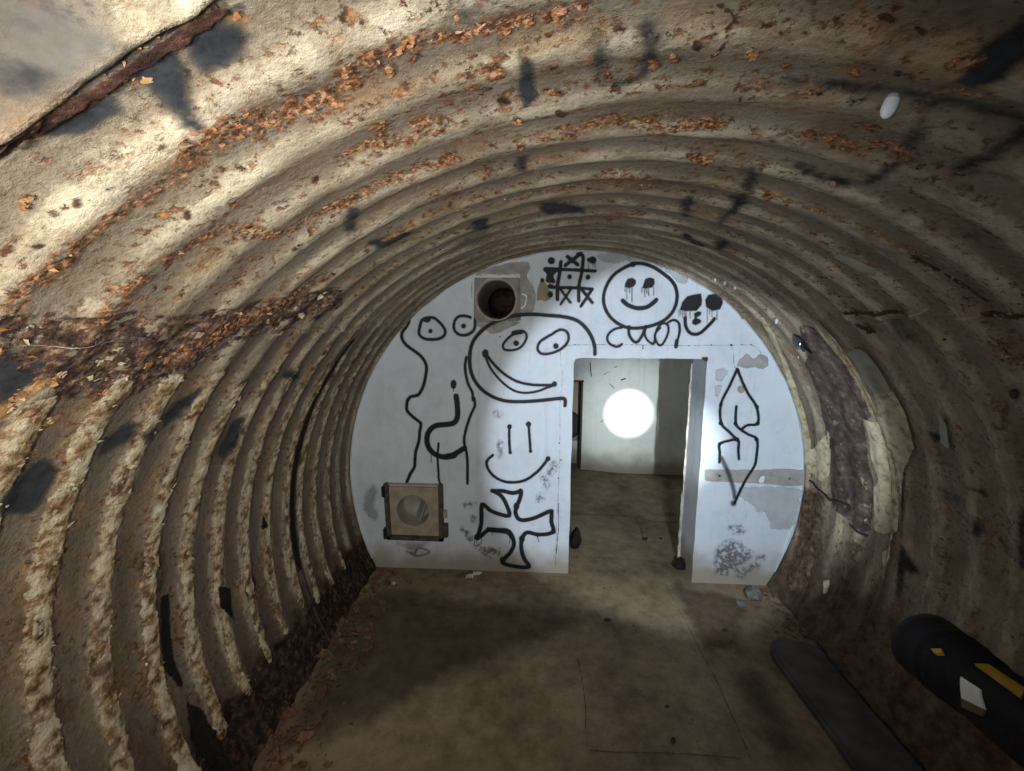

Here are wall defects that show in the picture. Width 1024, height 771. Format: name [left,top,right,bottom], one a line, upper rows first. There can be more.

rust [516,110,726,151]
rust [0,0,596,418]
peeling [702,317,914,580]
water stain [715,526,764,577]
rust [787,489,825,597]